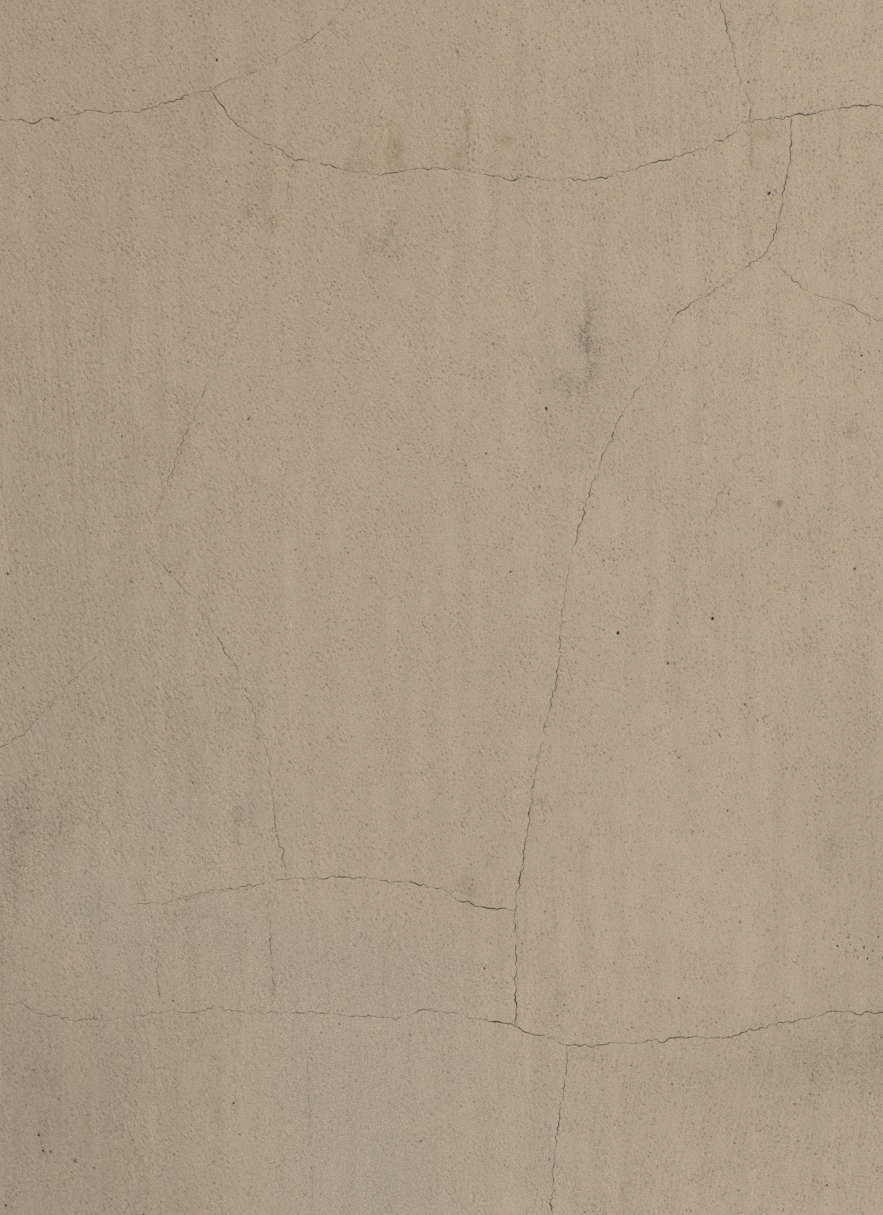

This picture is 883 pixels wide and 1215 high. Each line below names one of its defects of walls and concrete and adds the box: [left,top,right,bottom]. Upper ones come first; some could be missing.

crack [142,21,883,267]
crack [212,573,883,1210]